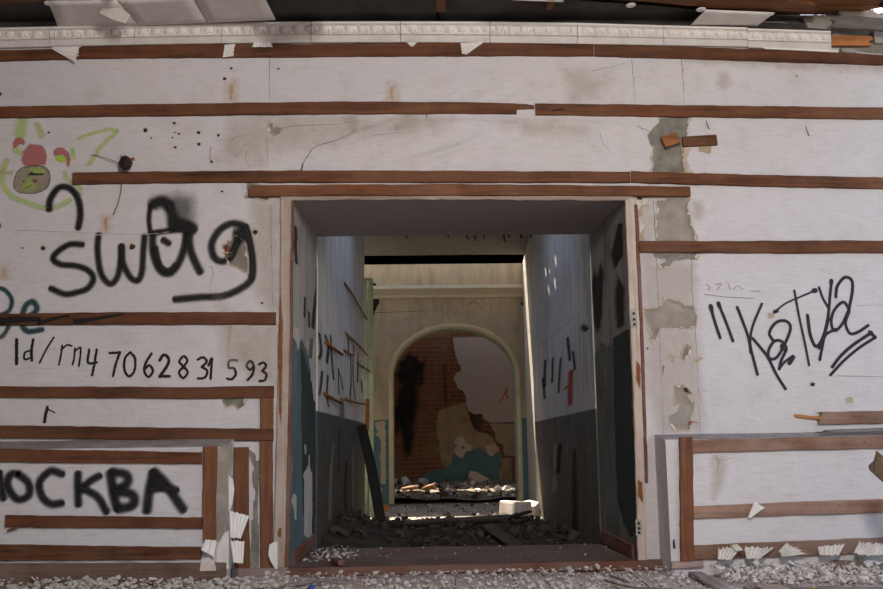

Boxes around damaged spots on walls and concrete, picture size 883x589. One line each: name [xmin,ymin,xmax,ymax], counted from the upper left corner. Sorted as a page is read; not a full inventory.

spalling [647,117,712,173]
spalling [635,198,698,241]
spalling [653,253,700,270]
spalling [643,297,698,343]
spalling [669,343,701,364]
peeling [278,297,317,538]
spalling [469,412,483,430]
spalling [668,384,696,431]
peeling [216,442,234,569]